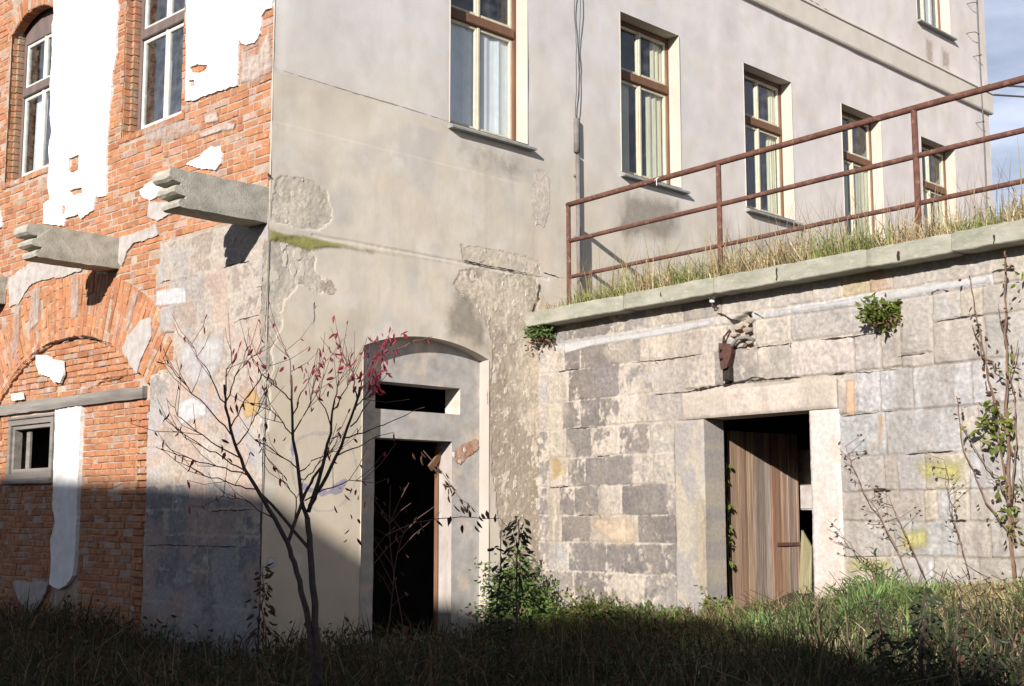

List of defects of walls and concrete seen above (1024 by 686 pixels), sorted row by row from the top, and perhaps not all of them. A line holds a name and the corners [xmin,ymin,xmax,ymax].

peeling [185,0,275,101]
peeling [43,0,120,226]
peeling [186,146,224,171]
peeling [118,181,170,266]
flaking render [269,176,332,230]
leakage [622,199,674,236]
peeling [8,262,83,307]
peeling [36,355,65,383]
peeling [122,317,153,373]
peeling [258,238,336,435]
peeling [452,244,541,597]